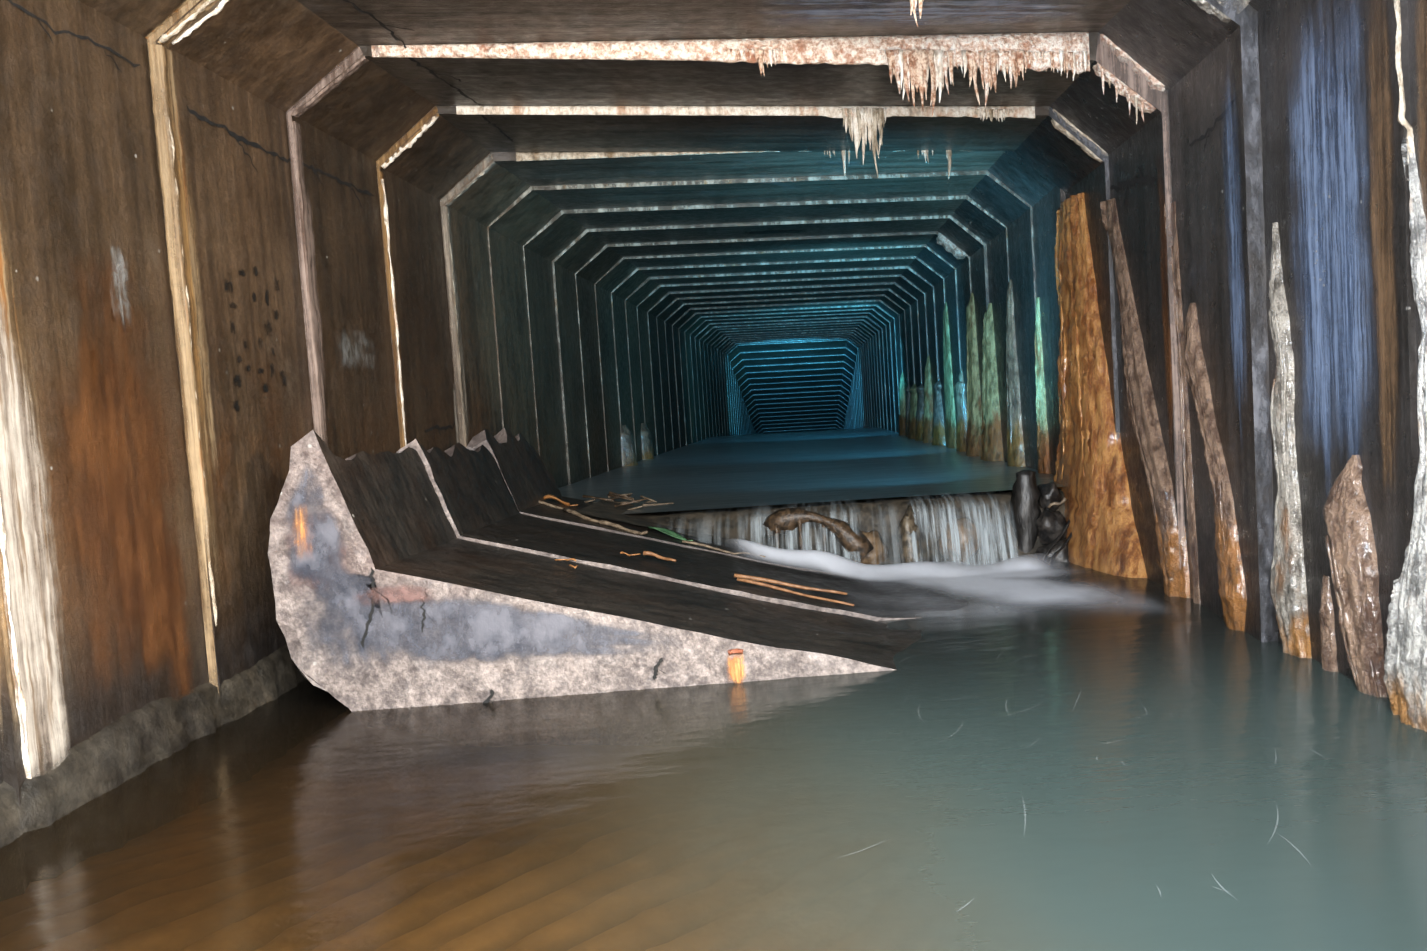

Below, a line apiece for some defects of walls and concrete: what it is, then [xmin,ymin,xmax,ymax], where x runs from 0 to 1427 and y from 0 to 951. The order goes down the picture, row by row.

crack [8,0,140,72]
crack [186,105,374,207]
water stain [1092,34,1172,263]
water stain [0,231,67,779]
water stain [1169,285,1185,569]